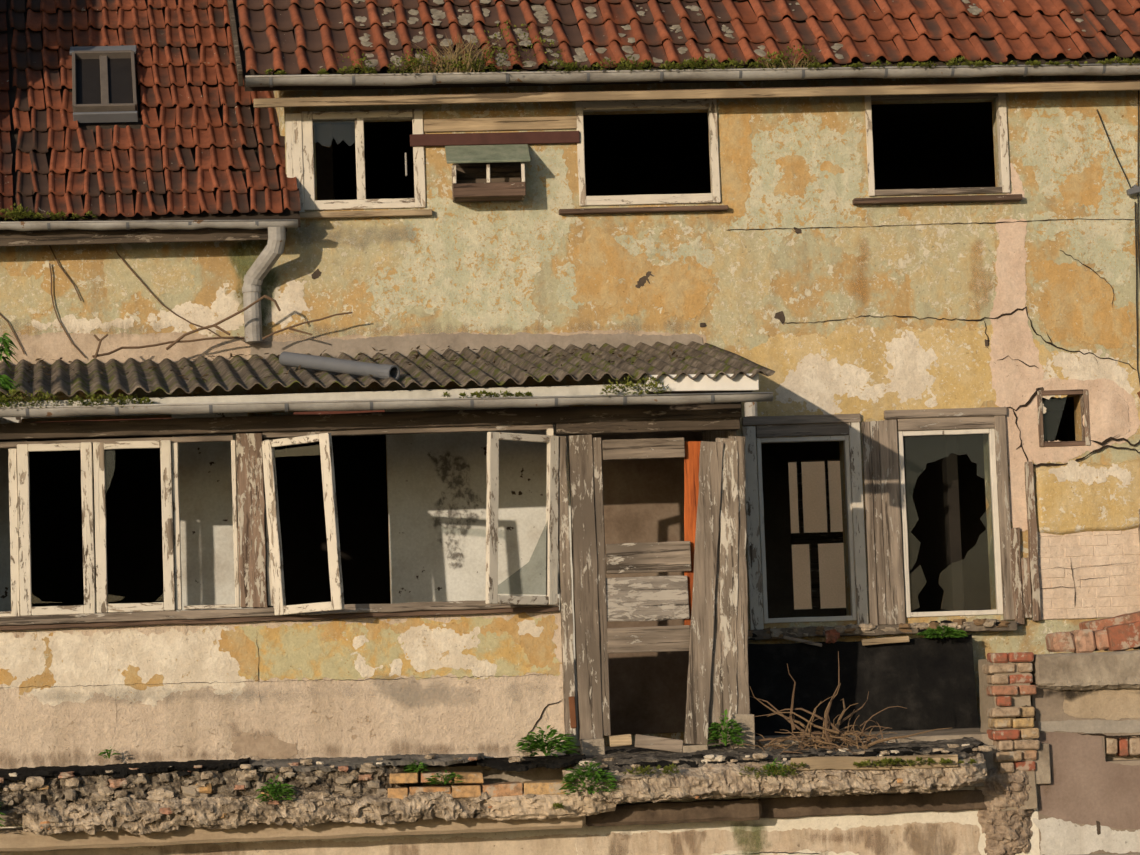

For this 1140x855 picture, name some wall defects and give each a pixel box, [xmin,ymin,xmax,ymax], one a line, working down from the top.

peeling [0,250,244,337]
peeling [612,100,997,431]
crack [730,218,1135,233]
peeling [1018,97,1140,432]
crack [1060,250,1114,307]
crack [781,306,1140,467]
leakage [428,453,478,567]
peeling [1048,460,1133,488]
peeling [0,612,562,708]
flaking render [1016,705,1140,855]
crack [1078,732,1140,740]